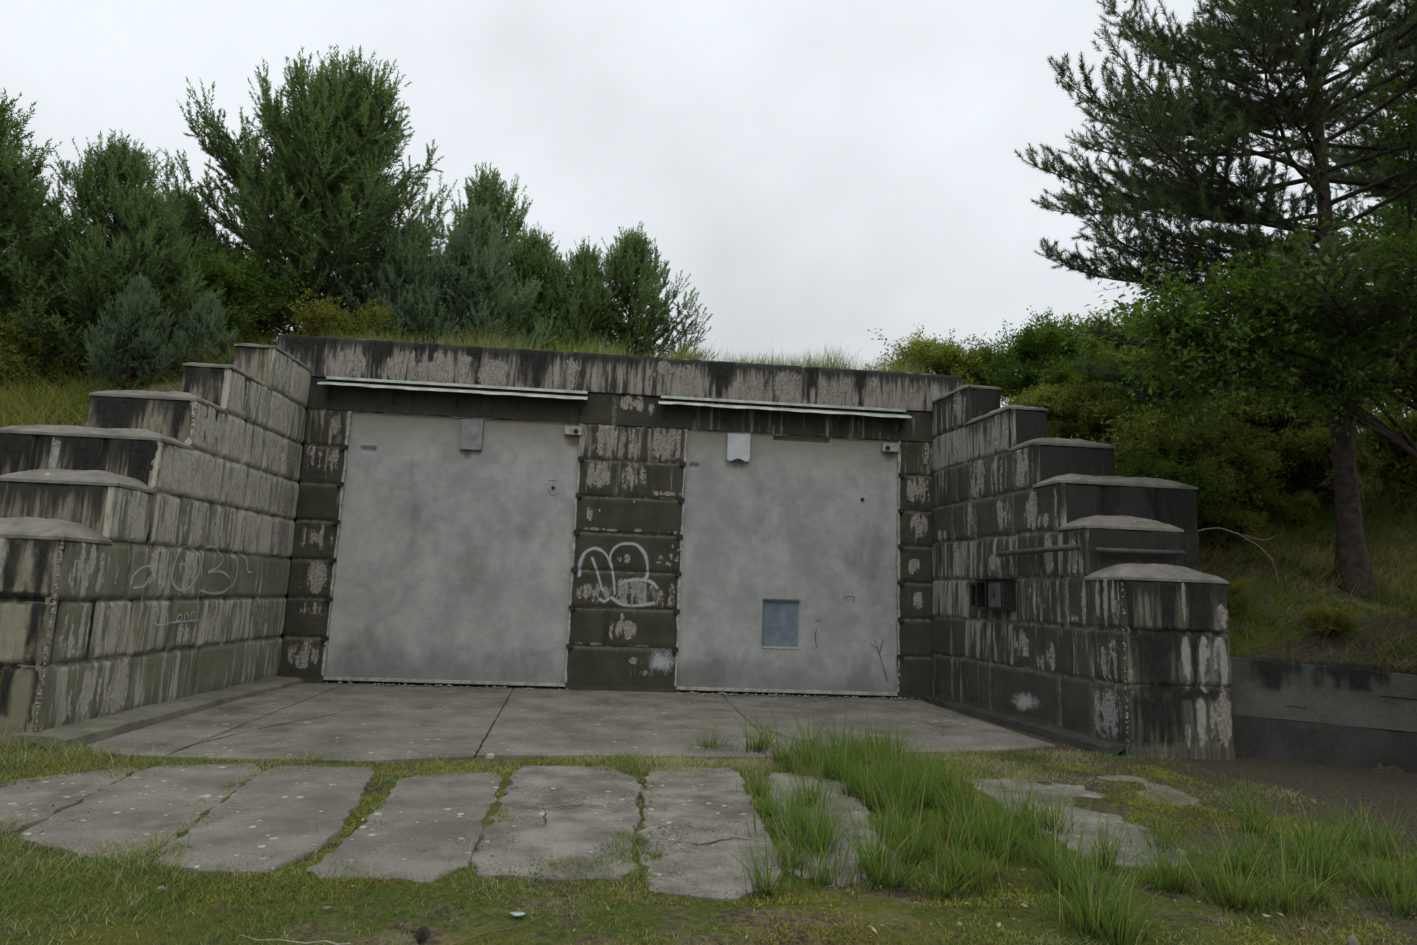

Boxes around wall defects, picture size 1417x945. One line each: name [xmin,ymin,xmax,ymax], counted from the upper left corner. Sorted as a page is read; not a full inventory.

peeling [586,395,688,503]
leakage [707,361,733,398]
leakage [802,367,818,402]
leakage [854,369,866,407]
leakage [0,537,56,729]
peeling [34,491,256,732]
peeling [300,525,333,616]
peeling [575,554,675,676]
peeling [907,393,1087,675]
peeling [1094,582,1130,742]
leakage [1095,579,1228,747]
leakage [1146,487,1195,534]